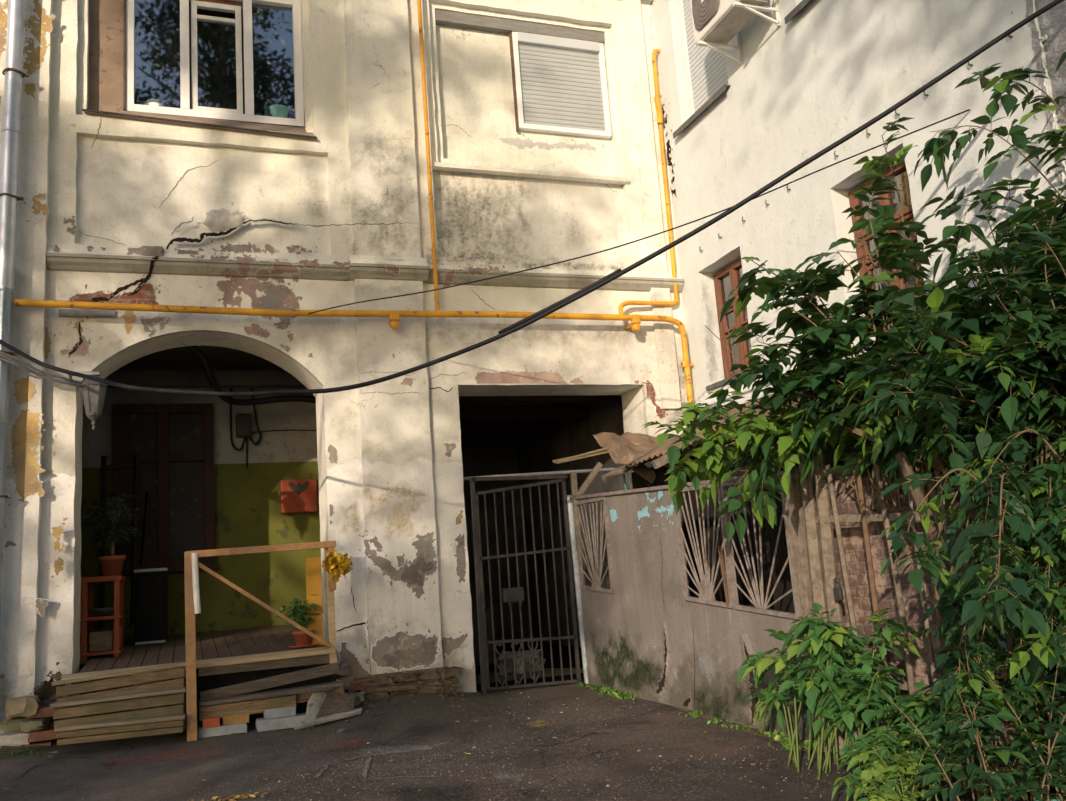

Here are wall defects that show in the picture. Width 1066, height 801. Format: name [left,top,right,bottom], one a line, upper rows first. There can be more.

peeling [0,0,8,57]
peeling [23,0,56,99]
flaking render [1011,0,1065,187]
crack [161,158,222,204]
crack [109,216,417,300]
peeling [174,233,352,352]
peeling [7,376,48,506]
flaking render [473,361,584,384]
flaking render [635,375,668,420]
flaking render [359,510,467,600]
flaking render [338,622,468,679]
crack [655,539,695,707]